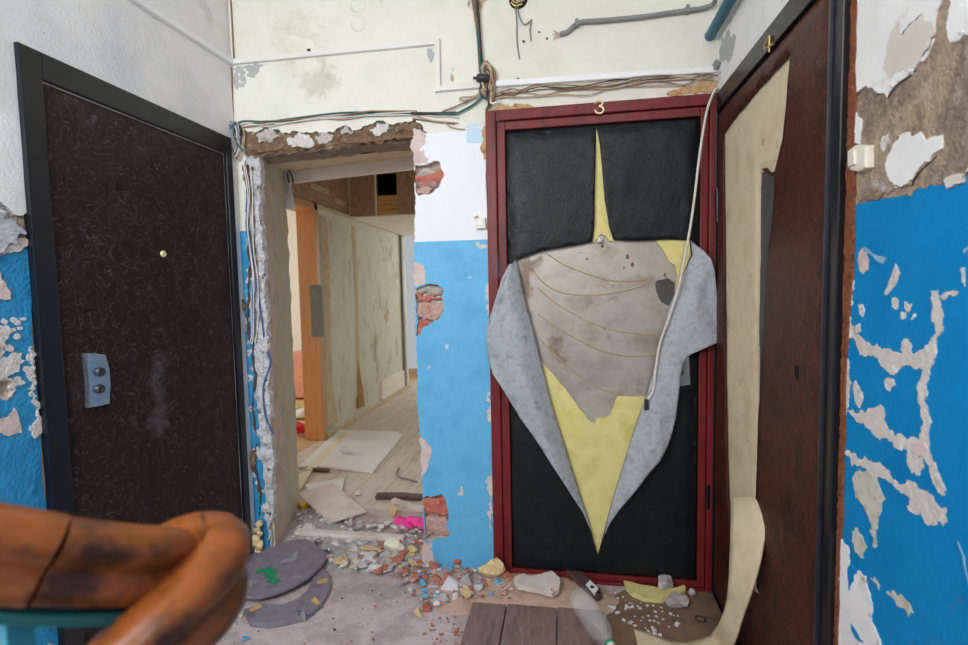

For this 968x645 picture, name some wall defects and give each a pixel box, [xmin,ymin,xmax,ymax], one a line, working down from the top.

flaking render [854,0,968,205]
peeling [0,273,11,300]
peeling [0,238,28,256]
peeling [0,317,42,438]
flaking render [236,121,444,540]
peeling [838,247,966,645]
flaking render [422,494,450,568]